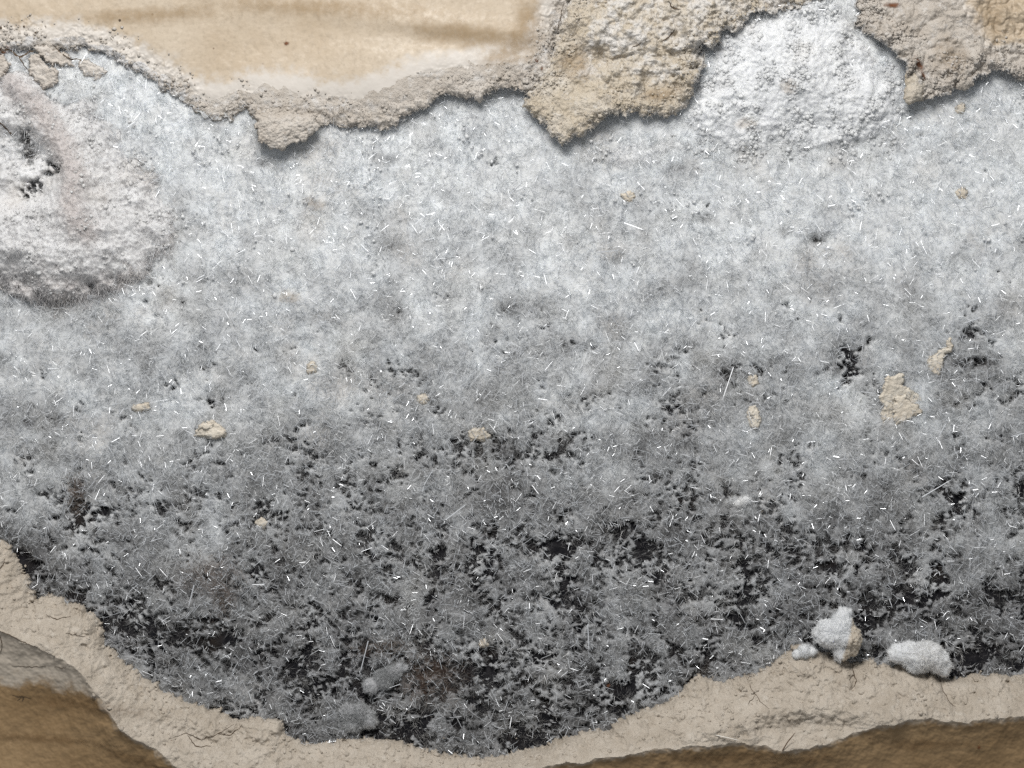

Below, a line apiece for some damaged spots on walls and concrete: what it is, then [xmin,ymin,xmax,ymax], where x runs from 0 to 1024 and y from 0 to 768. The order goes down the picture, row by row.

leakage [0,48,38,85]
peeling [0,0,821,146]
spalling [853,0,1024,114]
leakage [0,130,60,199]
spalling [927,337,954,376]
spalling [194,420,227,440]
spalling [468,427,491,442]
spalling [746,405,762,430]
spalling [879,373,923,425]
spalling [0,539,1024,768]
leakage [397,733,423,749]